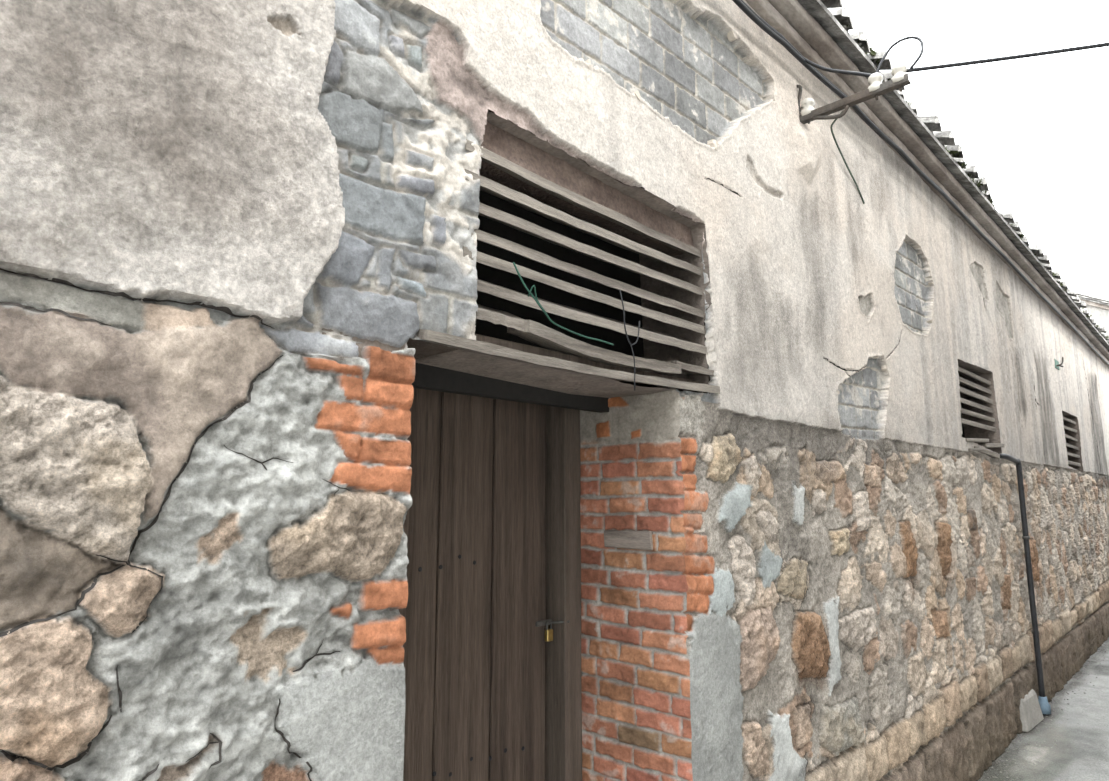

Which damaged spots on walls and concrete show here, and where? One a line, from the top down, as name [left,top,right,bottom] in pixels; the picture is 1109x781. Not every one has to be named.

spalling [536,0,776,152]
peeling [127,0,634,359]
peeling [0,261,109,291]
crack [0,268,275,329]
peeling [676,243,720,404]
spalling [893,232,935,338]
spalling [836,352,891,440]
crack [0,355,293,637]
crack [293,641,340,672]
crack [275,699,312,781]